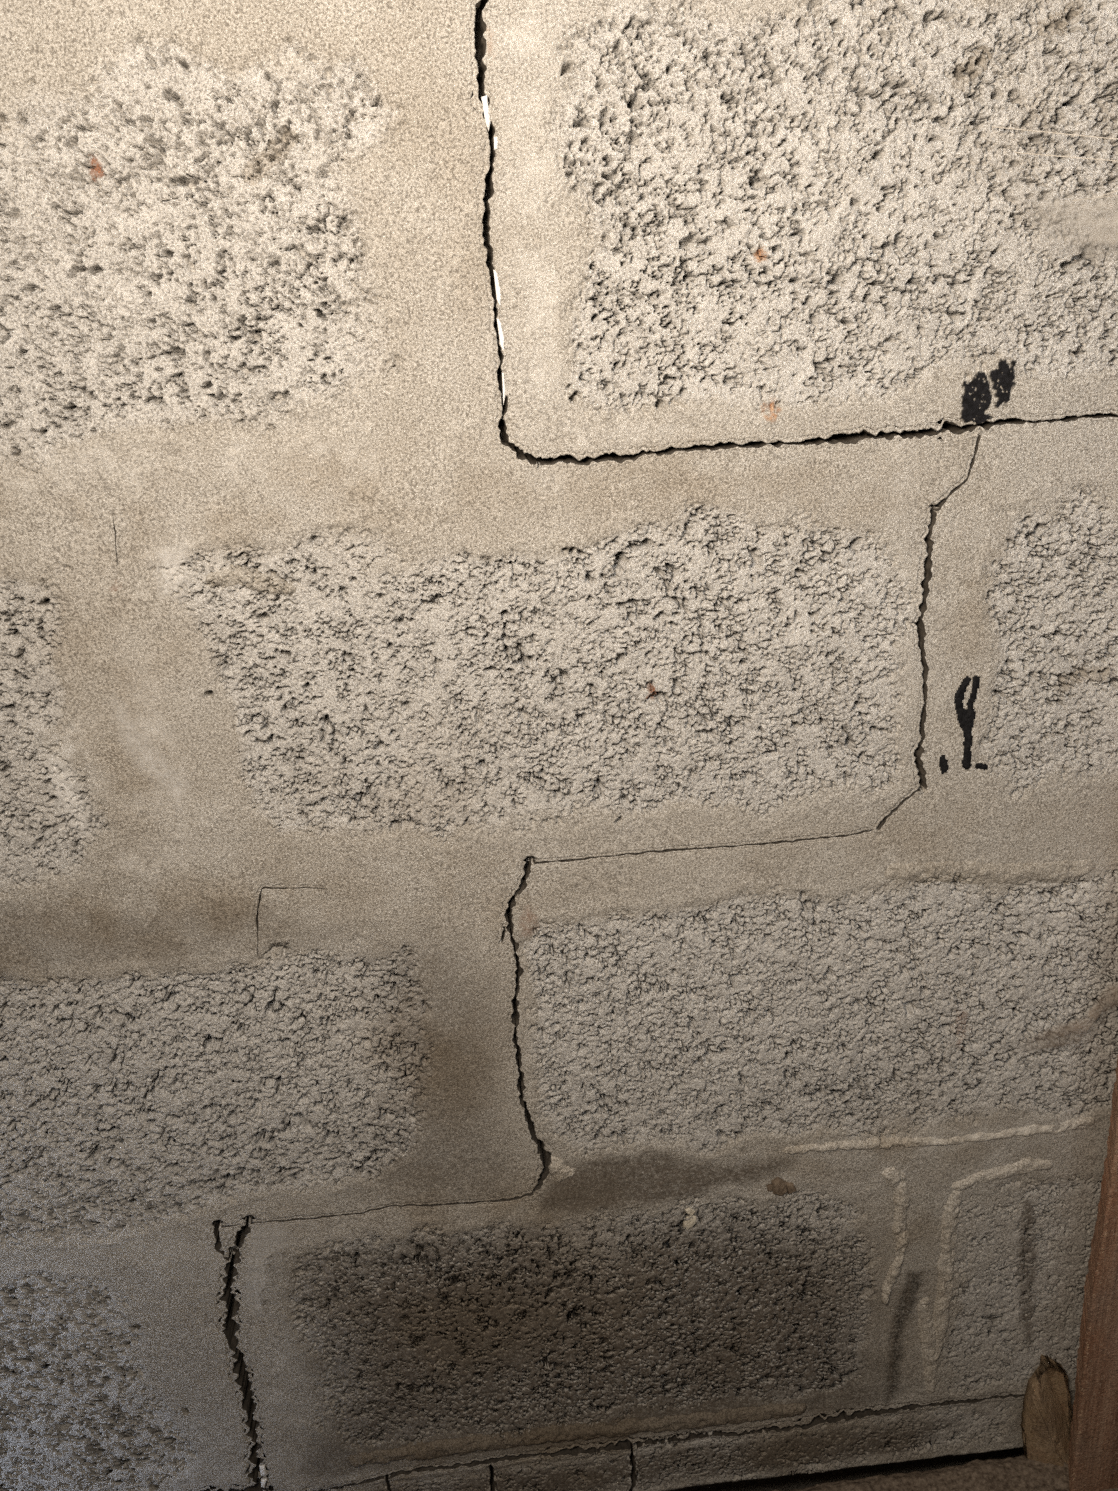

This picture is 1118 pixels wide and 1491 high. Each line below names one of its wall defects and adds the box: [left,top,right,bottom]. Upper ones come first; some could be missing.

crack [469,0,1118,832]
crack [110,513,121,569]
crack [192,827,874,1491]
damp [544,1156,778,1210]
damp [320,1229,851,1452]
crack [306,1391,1025,1491]